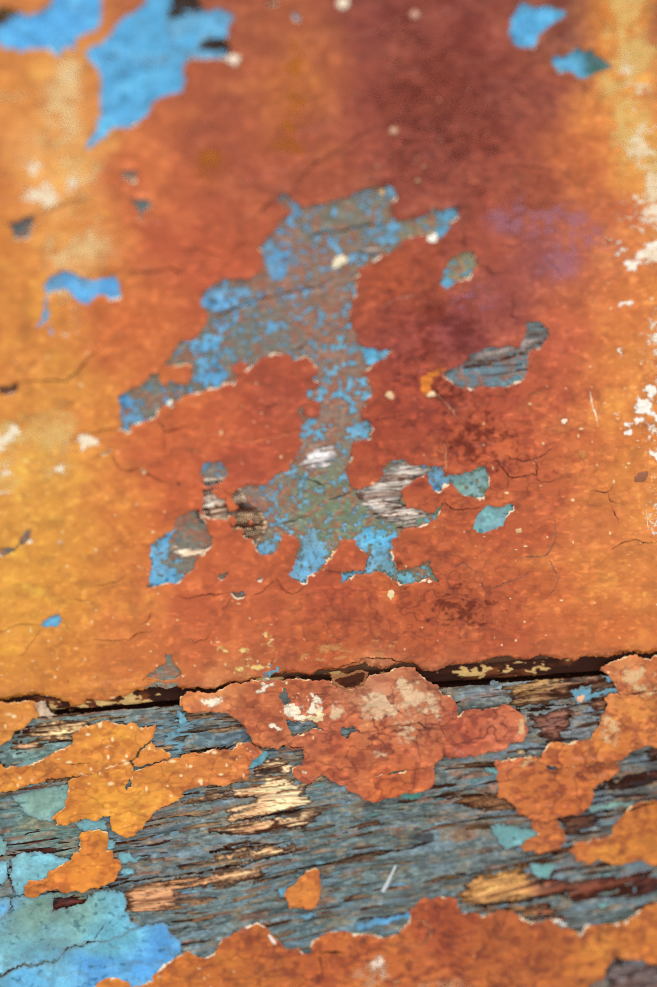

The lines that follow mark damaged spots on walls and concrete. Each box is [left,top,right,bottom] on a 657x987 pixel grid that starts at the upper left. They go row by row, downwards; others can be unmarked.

peeling [508,2,567,48]
peeling [0,0,235,149]
peeling [552,47,612,79]
peeling [36,271,121,336]
peeling [118,185,513,588]
peeling [420,321,549,396]
crack [489,449,562,494]
crack [592,484,652,548]
crack [455,516,558,602]
peeling [0,654,657,987]